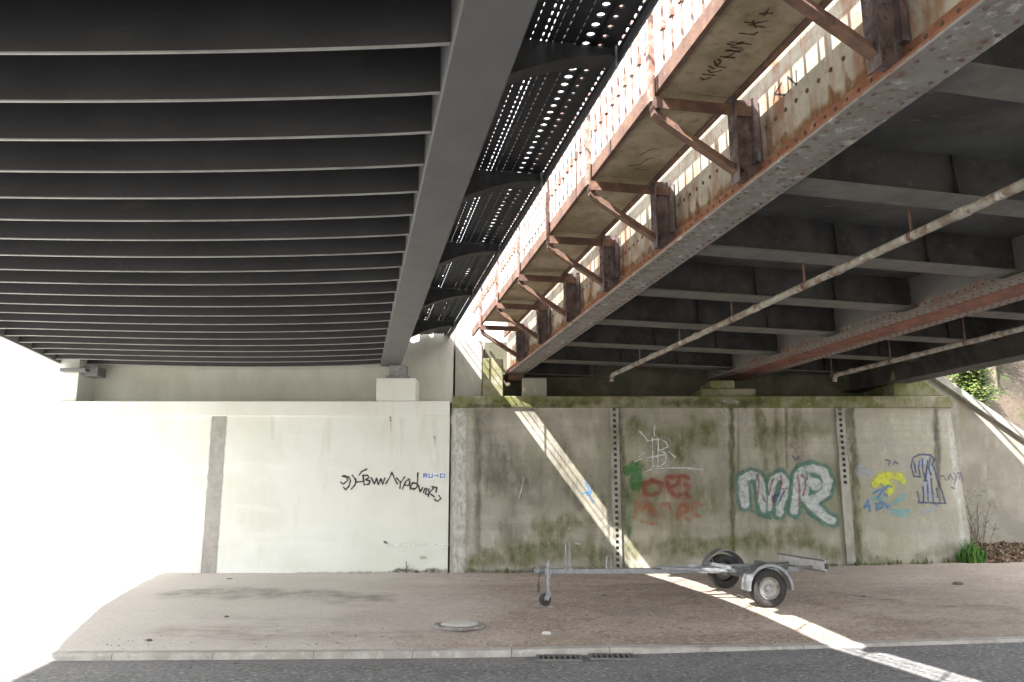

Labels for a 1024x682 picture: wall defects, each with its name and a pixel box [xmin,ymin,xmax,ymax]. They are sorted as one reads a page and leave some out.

rust [766,58,868,152]
rust [678,184,732,230]
water stain [719,408,760,552]
water stain [848,408,861,562]
water stain [923,410,955,500]